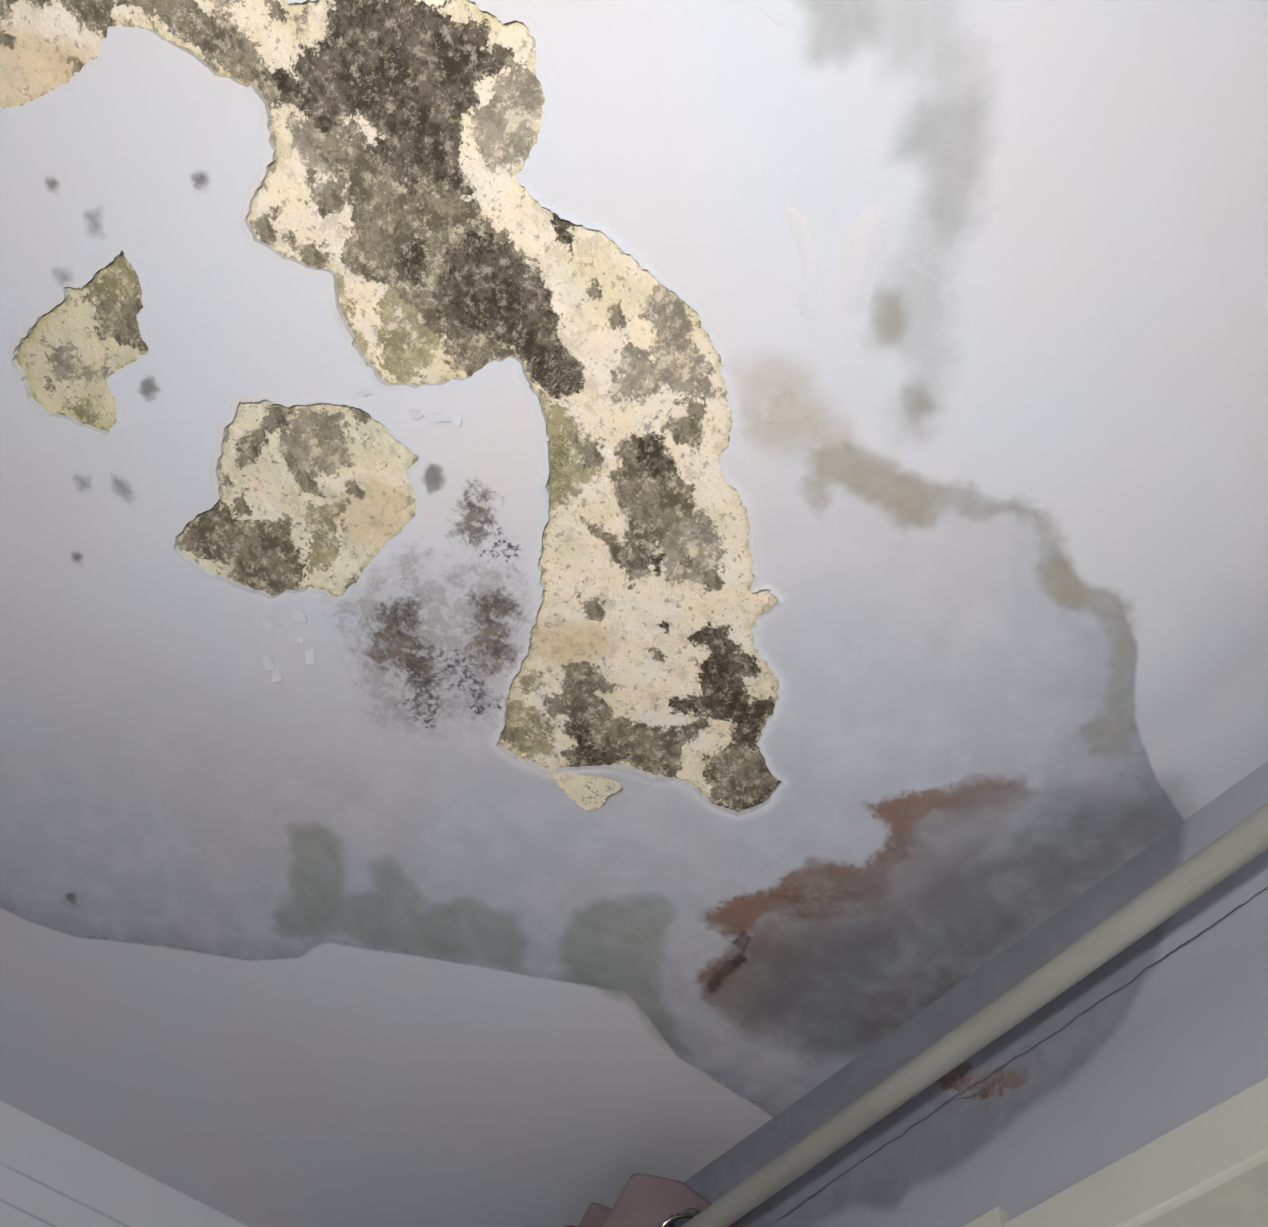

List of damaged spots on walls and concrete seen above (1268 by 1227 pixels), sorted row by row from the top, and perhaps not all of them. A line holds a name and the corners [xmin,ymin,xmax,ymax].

peeling [0,0,788,821]
leakage [425,467,441,489]
leakage [455,487,522,570]
leakage [370,589,521,729]
rust [704,874,811,994]